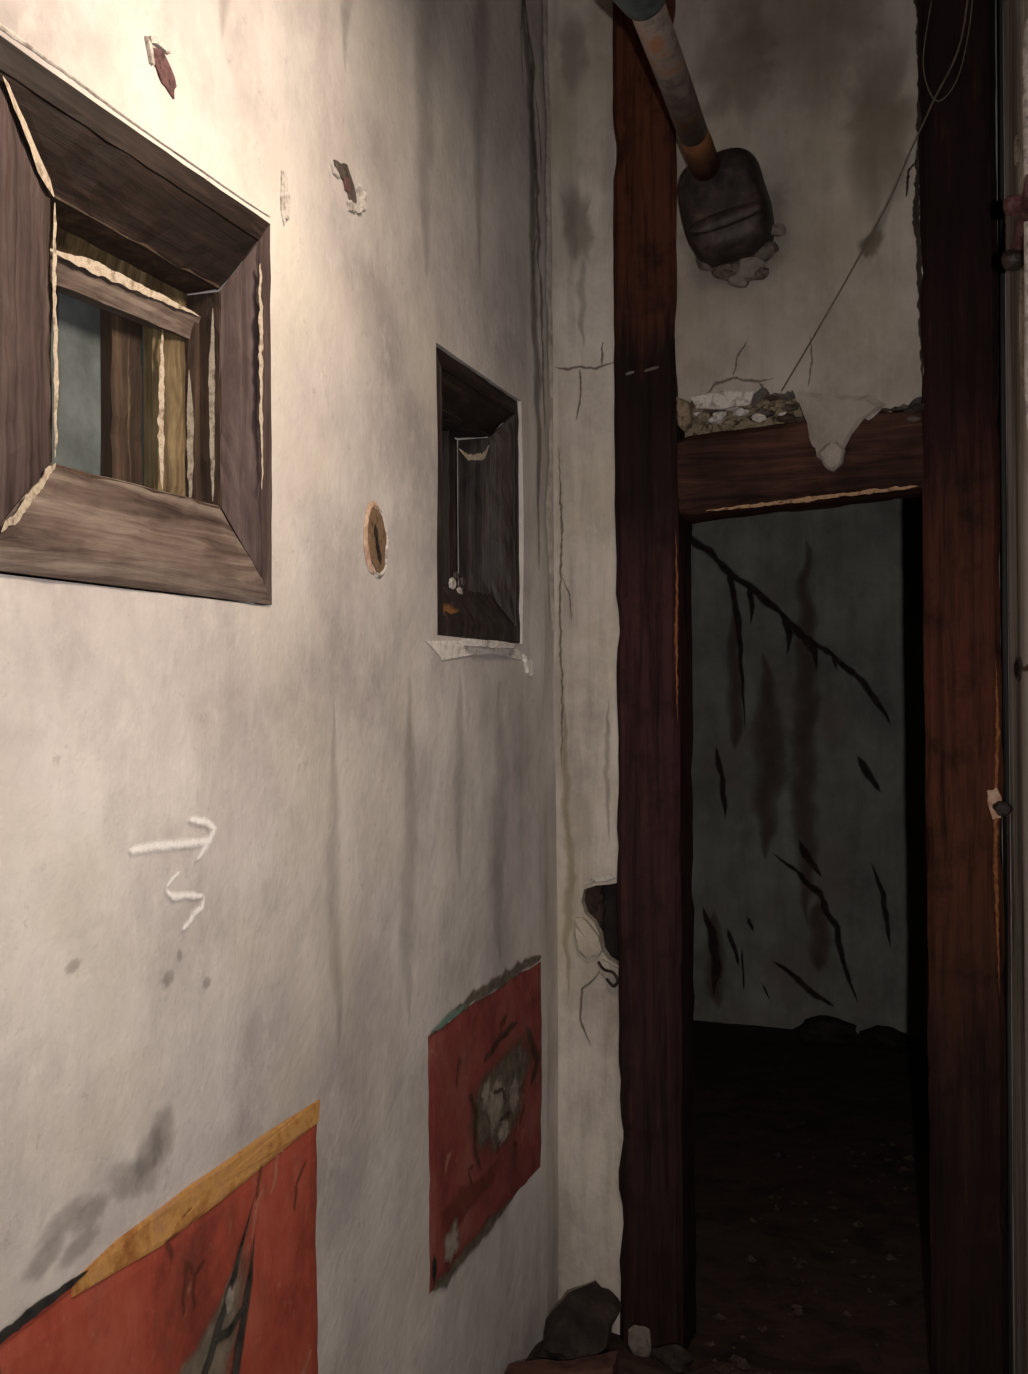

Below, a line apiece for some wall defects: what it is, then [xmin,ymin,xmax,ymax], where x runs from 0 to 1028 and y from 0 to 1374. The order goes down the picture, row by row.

flaking render [0,23,291,226]
flaking render [330,159,367,214]
flaking render [676,390,925,473]
flaking render [363,501,388,578]
crack [691,536,890,723]
crack [715,748,727,816]
crack [857,756,880,791]
flaking render [574,875,619,1043]
crack [703,840,857,1006]
crack [872,865,891,946]